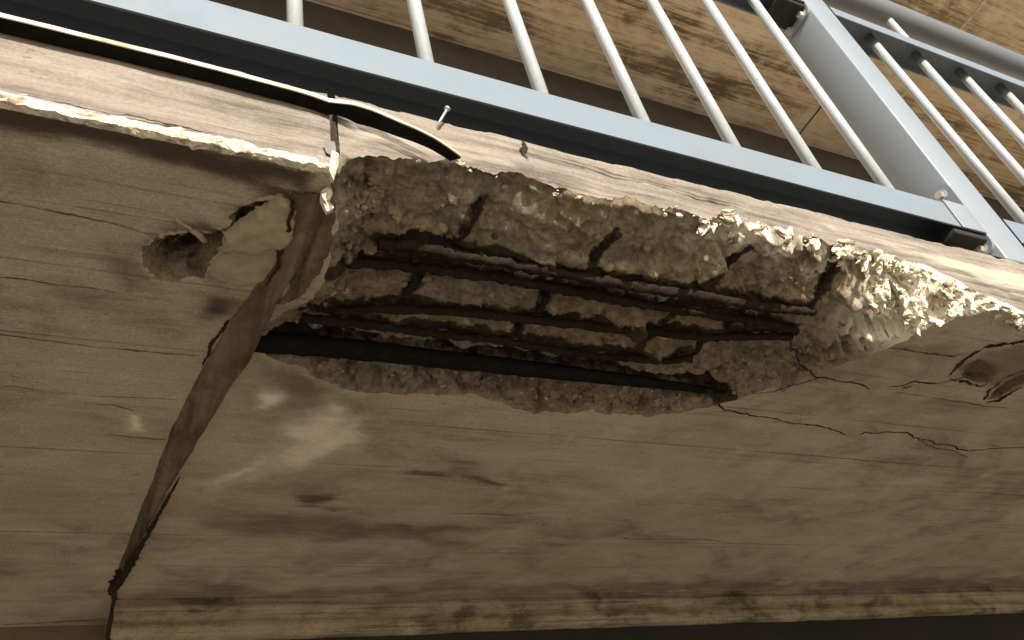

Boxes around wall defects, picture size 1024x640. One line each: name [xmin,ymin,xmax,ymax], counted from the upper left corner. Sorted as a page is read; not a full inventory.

crack [0,277,62,286]
crack [266,198,295,286]
spalling [0,93,1024,417]
crack [0,334,86,346]
crack [123,319,229,368]
crack [93,396,140,411]
crack [707,342,1023,496]
crack [107,477,180,600]